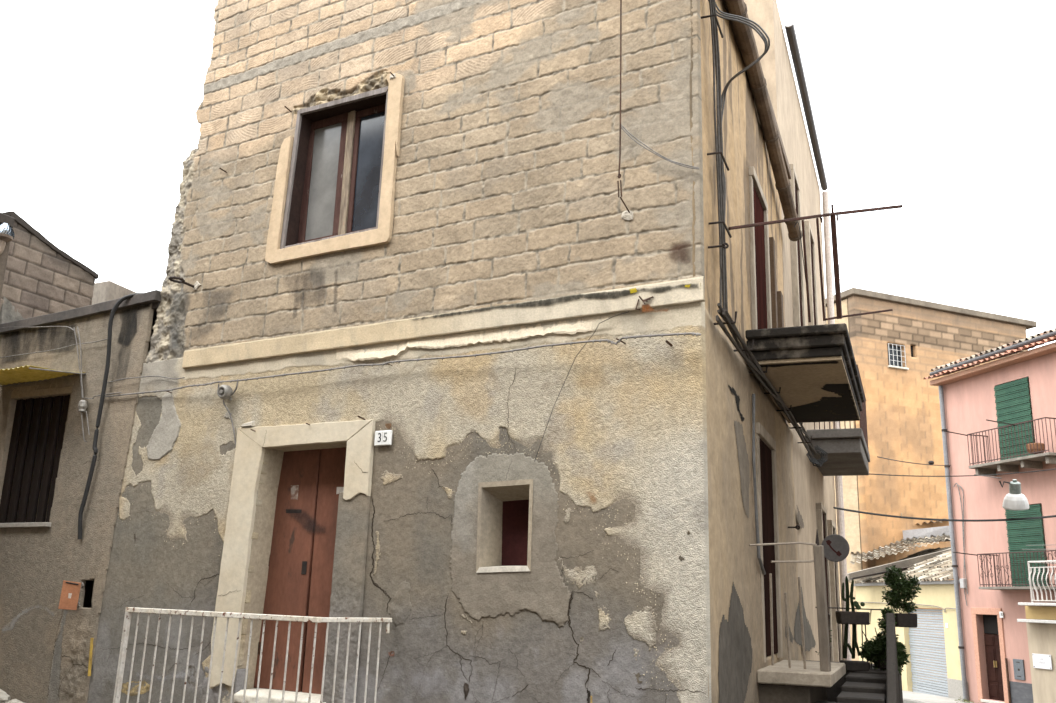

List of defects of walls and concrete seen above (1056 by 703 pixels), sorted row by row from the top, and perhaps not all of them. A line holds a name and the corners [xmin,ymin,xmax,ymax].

peeling [220,439,236,455]
peeling [87,396,224,703]
crack [354,461,452,610]
peeling [356,420,680,703]
crack [377,550,706,703]